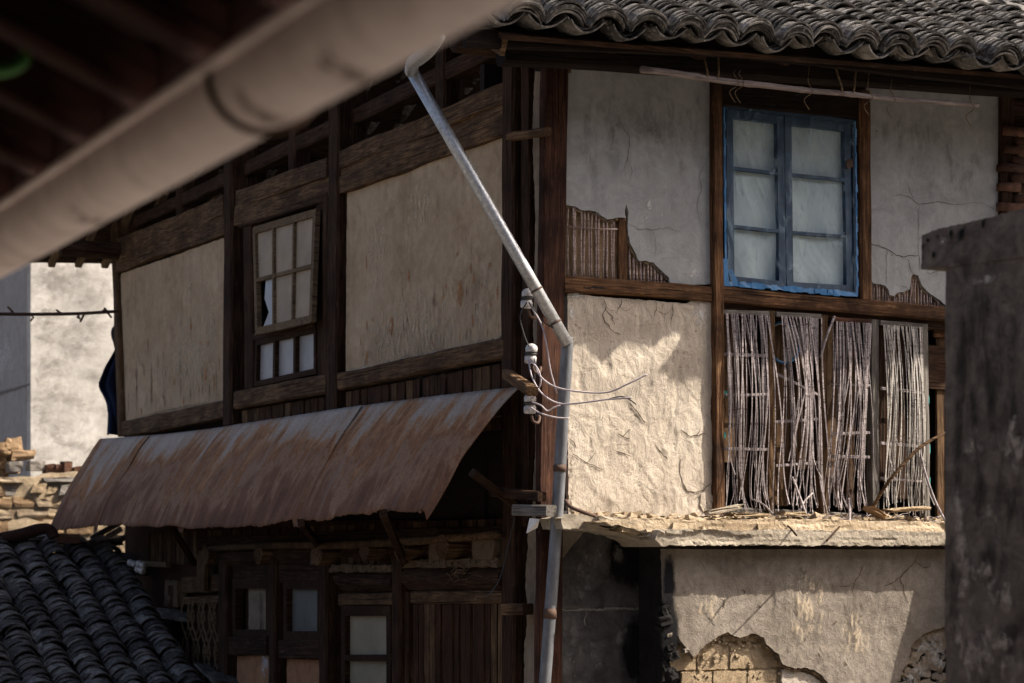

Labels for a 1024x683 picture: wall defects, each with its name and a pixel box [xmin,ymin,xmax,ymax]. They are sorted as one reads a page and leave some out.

flaking render [565,205,668,282]
crack [872,184,995,291]
crack [602,300,673,335]
flaking render [872,275,944,307]
crack [569,404,667,475]
crack [885,557,930,603]
flaking render [653,603,825,683]
flaking render [898,627,946,683]